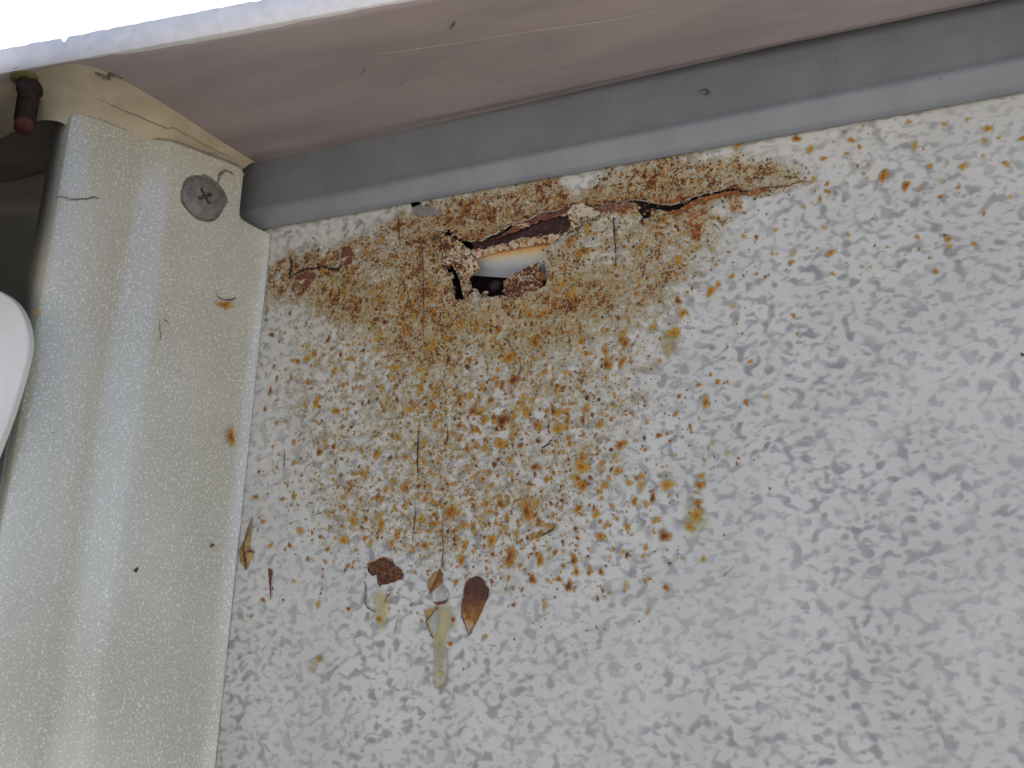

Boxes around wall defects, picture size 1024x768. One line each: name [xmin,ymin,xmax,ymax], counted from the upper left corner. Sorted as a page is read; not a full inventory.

spalling [445,230,474,250]
crack [573,181,813,268]
spalling [447,266,518,300]
rust [252,130,888,628]
peeling [238,518,254,570]
spalling [367,556,404,588]
peeling [427,569,442,594]
peeling [424,607,439,638]
spalling [461,576,489,636]